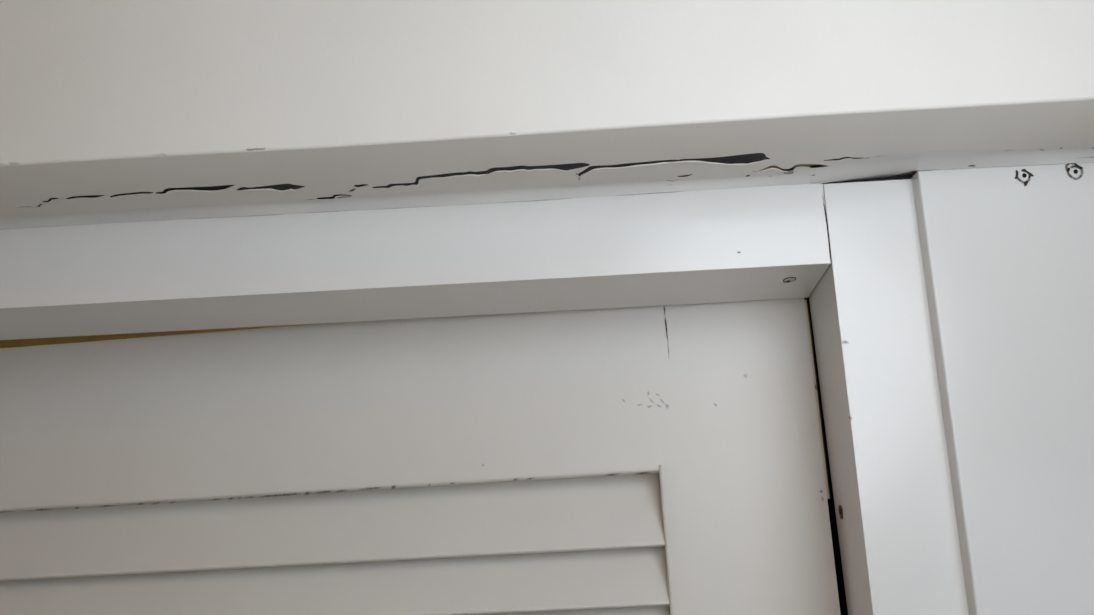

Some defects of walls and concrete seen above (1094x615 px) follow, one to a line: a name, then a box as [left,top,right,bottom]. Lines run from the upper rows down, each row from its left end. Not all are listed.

crack [28,153,929,258]